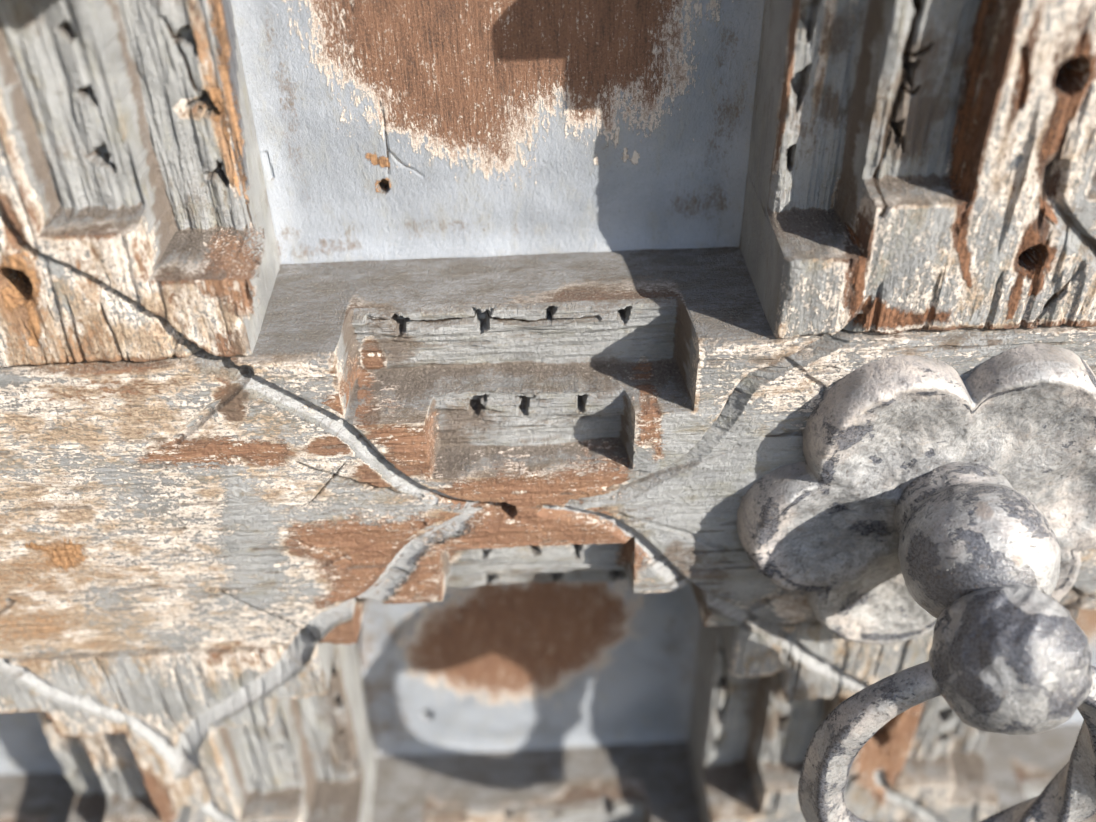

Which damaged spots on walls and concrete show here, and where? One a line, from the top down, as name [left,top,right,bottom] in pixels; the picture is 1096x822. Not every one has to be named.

peeling [277,0,733,194]
crack [1032,268,1078,324]
peeling [134,431,293,474]
crack [307,464,345,506]
peeling [274,344,670,710]
peeling [1076,609,1096,650]